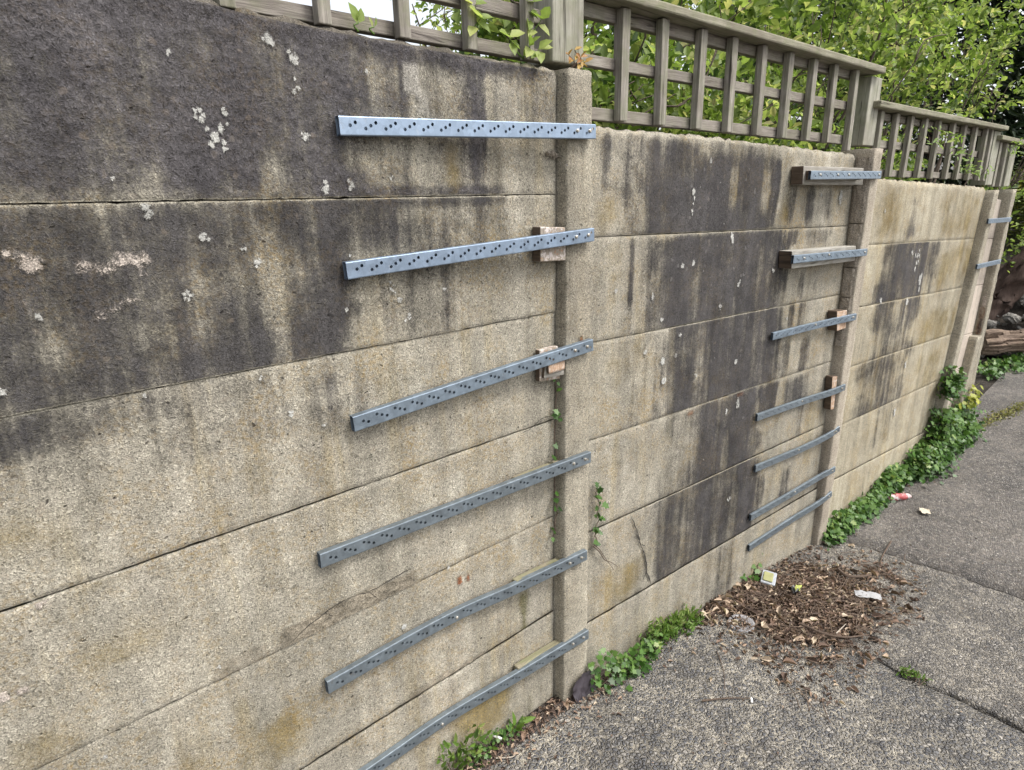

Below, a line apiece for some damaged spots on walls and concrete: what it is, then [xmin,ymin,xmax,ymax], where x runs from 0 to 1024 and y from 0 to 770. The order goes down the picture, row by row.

leakage [0,0,545,465]
leakage [603,134,612,187]
leakage [624,136,831,597]
leakage [857,218,954,416]
crack [290,569,410,643]
crack [632,519,651,584]